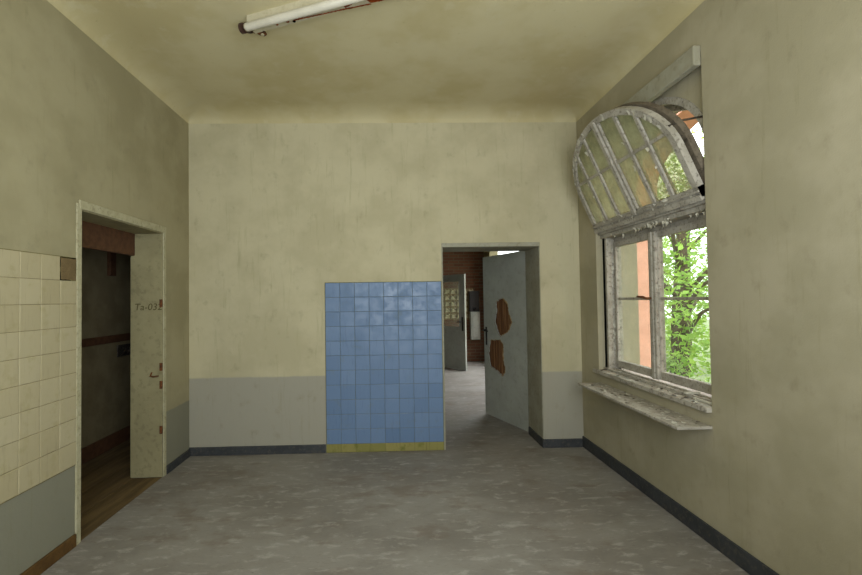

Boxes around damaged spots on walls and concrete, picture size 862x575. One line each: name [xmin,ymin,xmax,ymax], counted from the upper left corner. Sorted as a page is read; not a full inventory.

peeling [60,257,76,281]